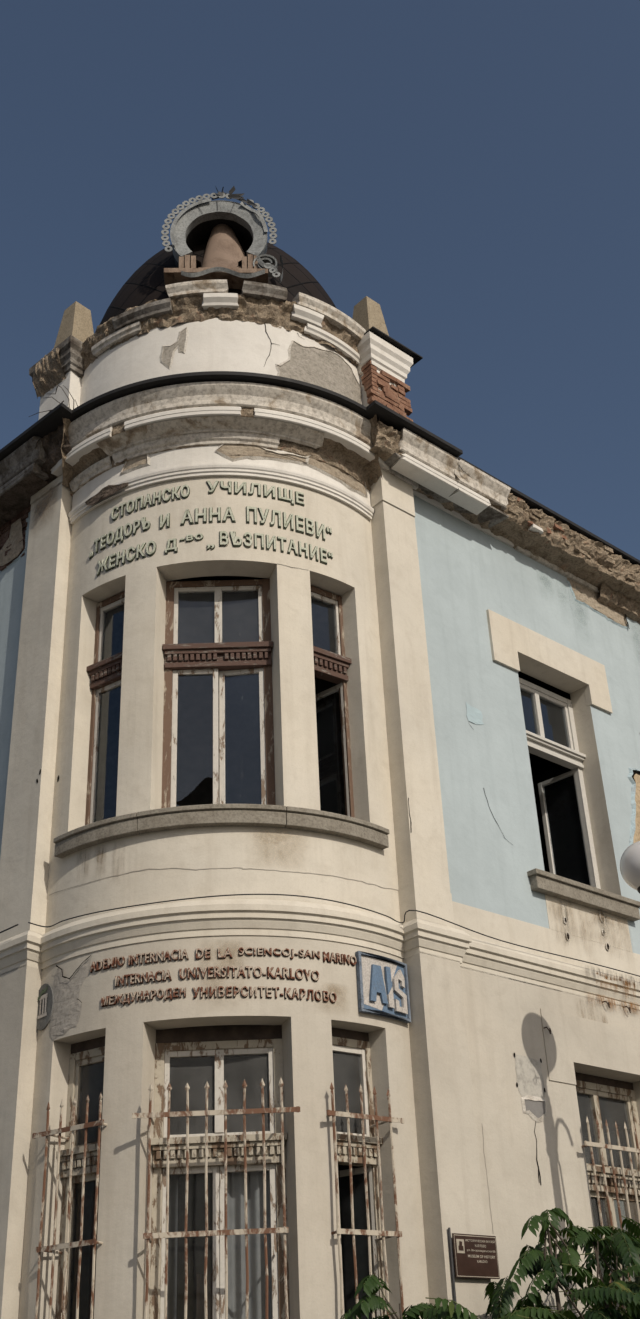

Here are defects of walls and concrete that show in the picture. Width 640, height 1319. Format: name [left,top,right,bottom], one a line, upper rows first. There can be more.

flaking render [159,327,189,369]
flaking render [275,340,413,422]
flaking render [0,498,46,571]
flaking render [566,578,629,629]
flaking render [627,768,640,846]
flaking render [50,956,92,1040]
flaking render [521,1095,547,1123]